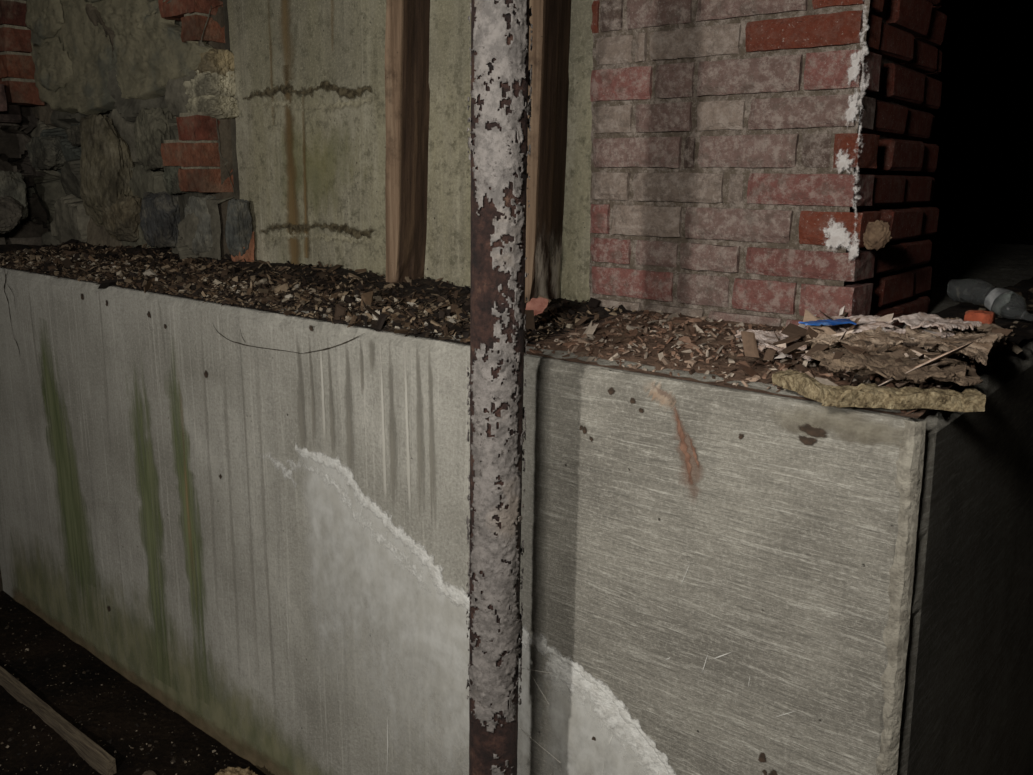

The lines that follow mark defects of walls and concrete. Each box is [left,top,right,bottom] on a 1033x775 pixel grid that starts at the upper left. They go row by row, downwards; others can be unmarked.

efflorescence [823,7,869,260]
damp [41,343,94,609]
damp [0,376,287,775]
damp [263,343,470,759]
efflorescence [517,628,676,775]
corrosion [649,384,700,489]